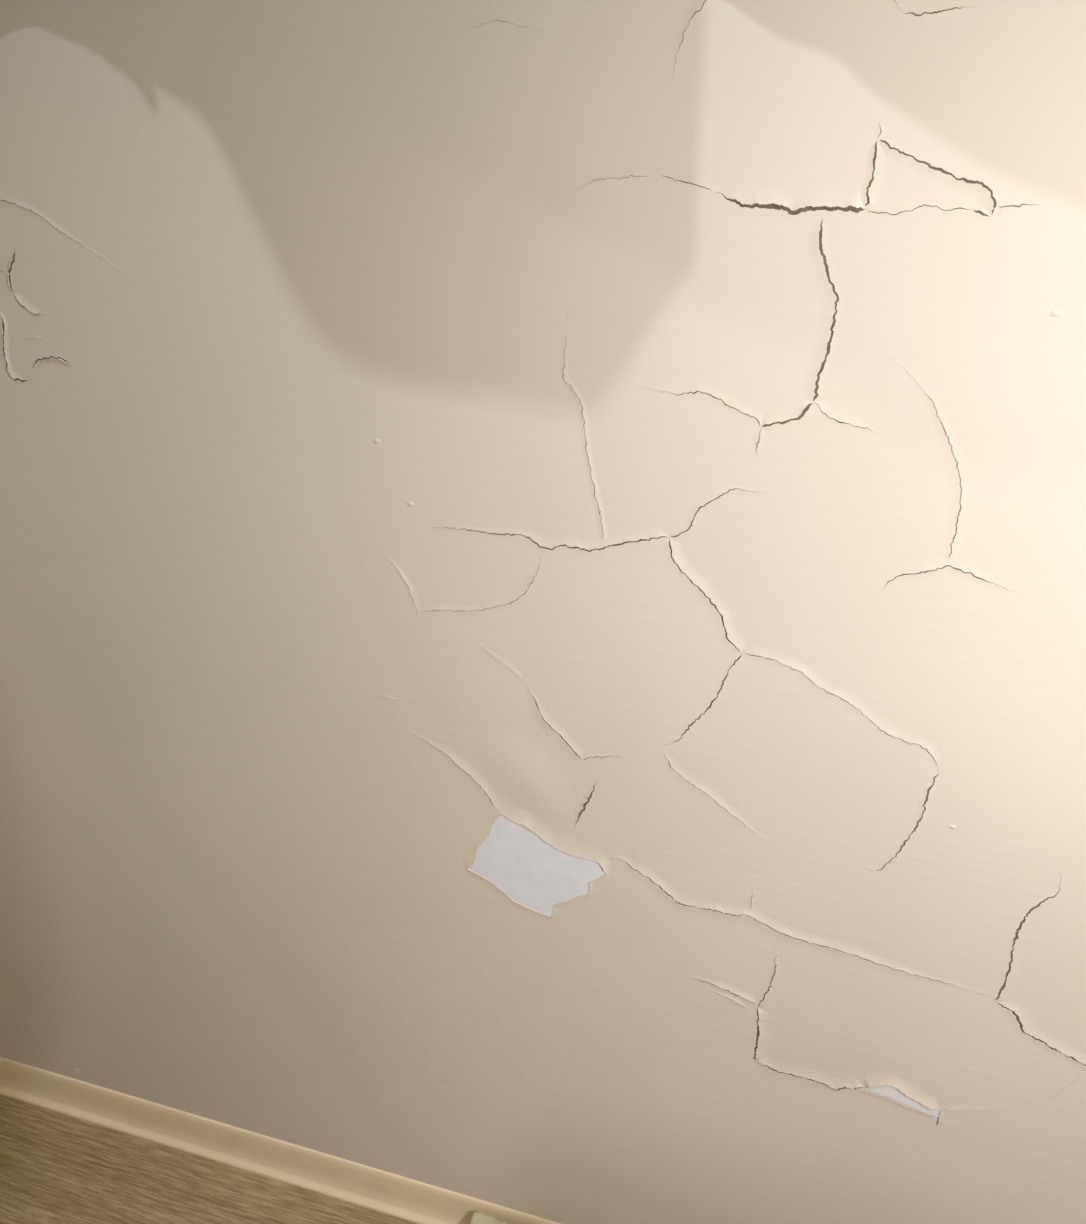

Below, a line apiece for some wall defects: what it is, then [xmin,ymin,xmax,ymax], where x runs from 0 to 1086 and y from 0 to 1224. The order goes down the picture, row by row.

crack [0,192,142,289]
crack [642,216,883,459]
crack [384,312,941,872]
crack [876,348,1023,597]
peeling [397,722,613,920]
peeling [683,945,1009,1127]
crack [608,855,1086,1104]